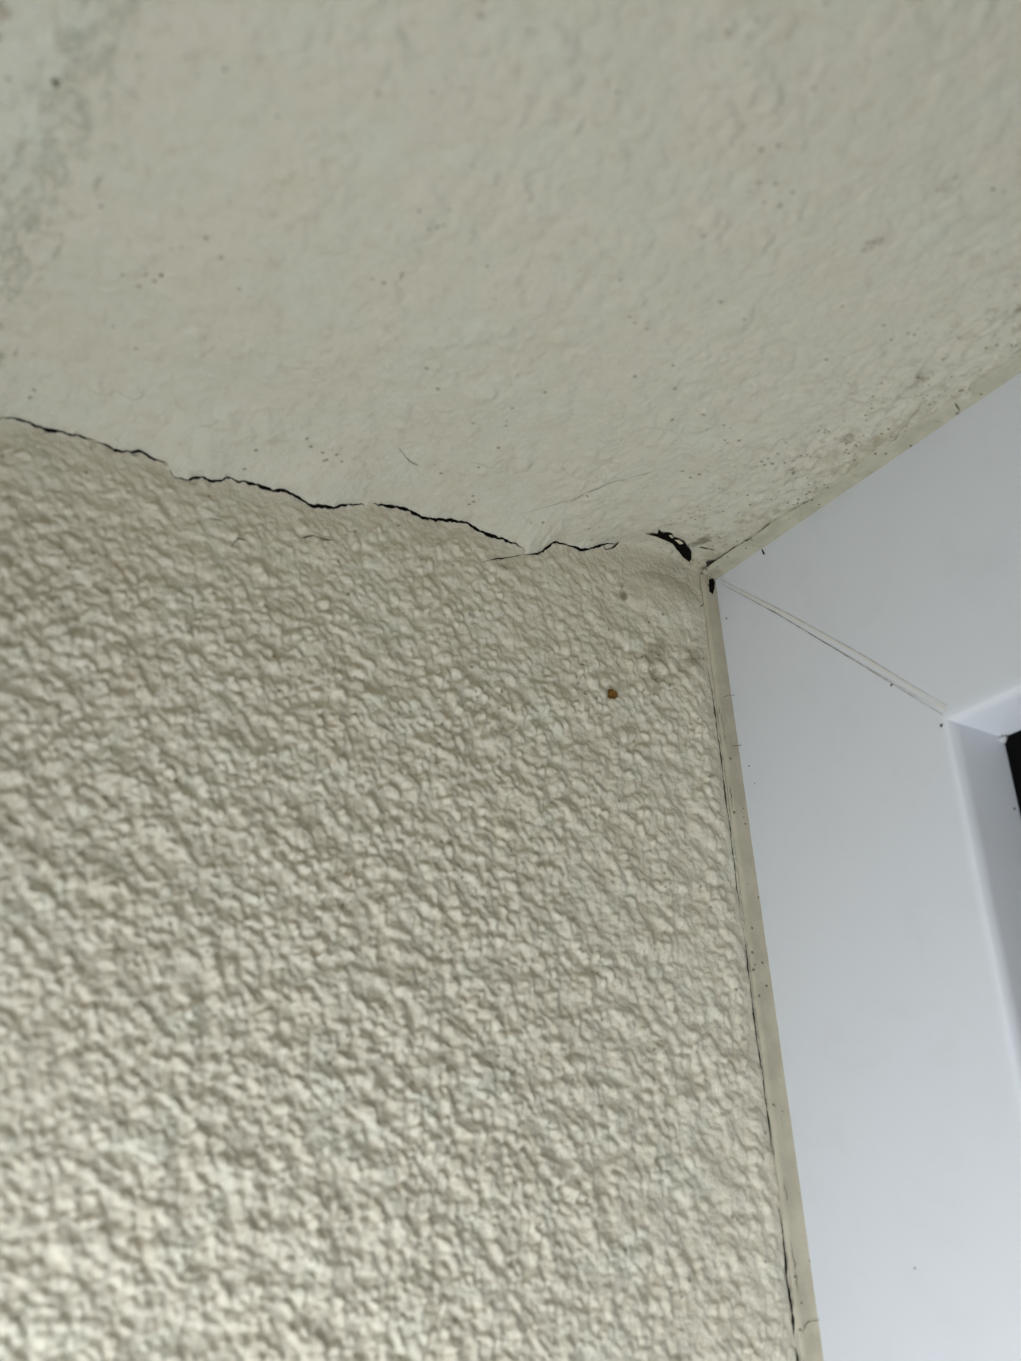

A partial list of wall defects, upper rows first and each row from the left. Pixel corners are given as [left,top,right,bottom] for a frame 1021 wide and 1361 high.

crack [0,417,619,568]